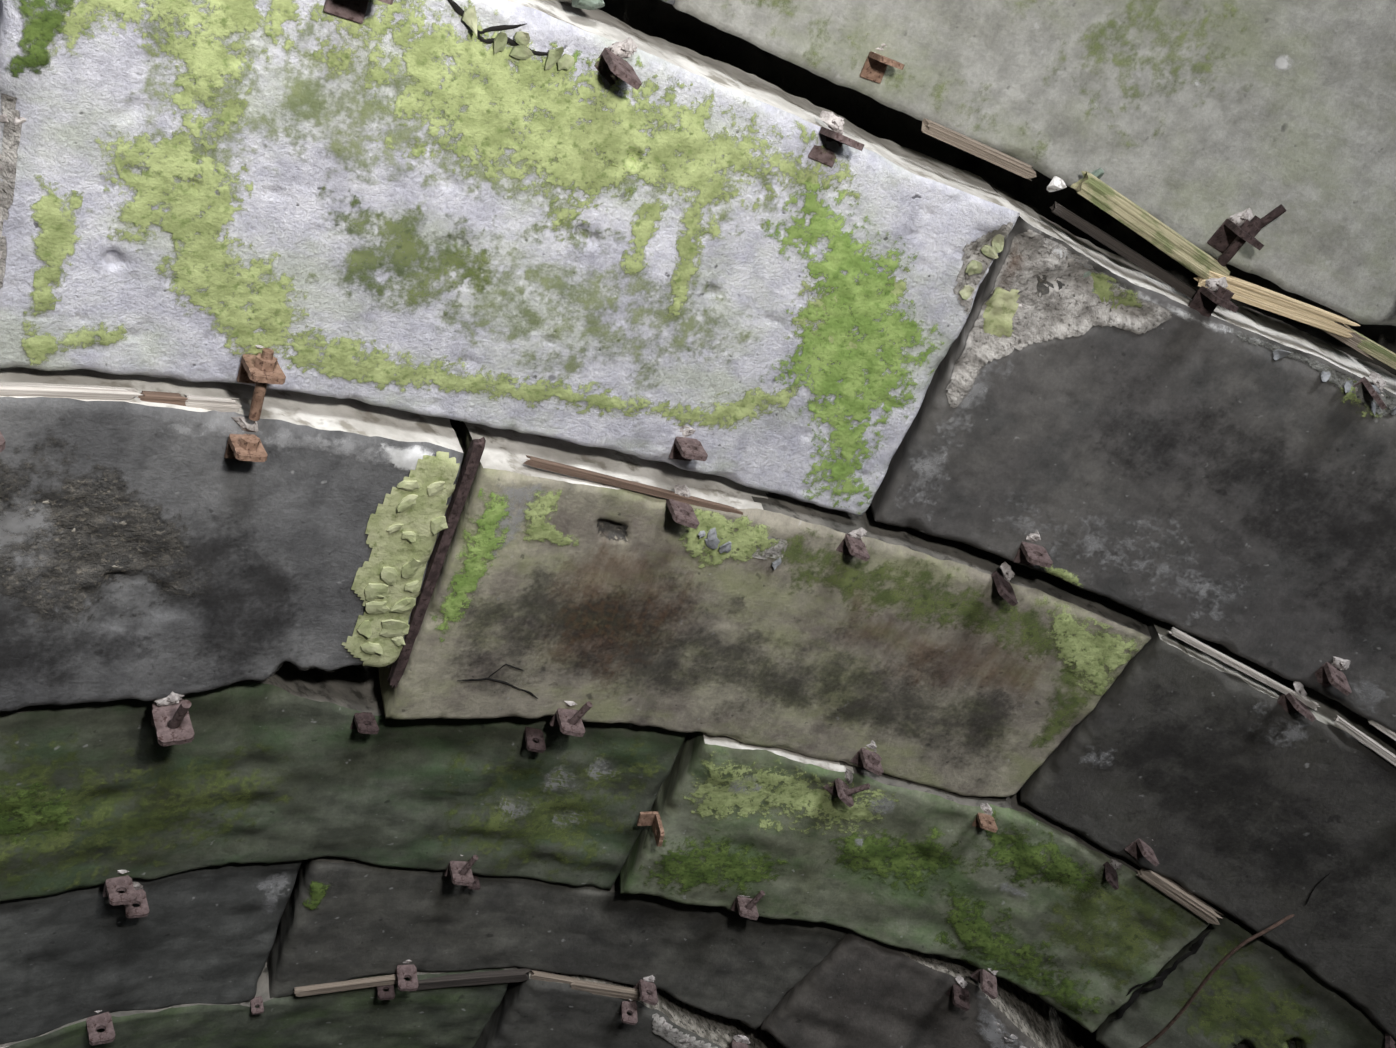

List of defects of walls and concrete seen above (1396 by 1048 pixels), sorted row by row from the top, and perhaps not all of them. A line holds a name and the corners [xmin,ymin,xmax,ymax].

spalling [946,222,1172,408]
leakage [479,581,806,702]